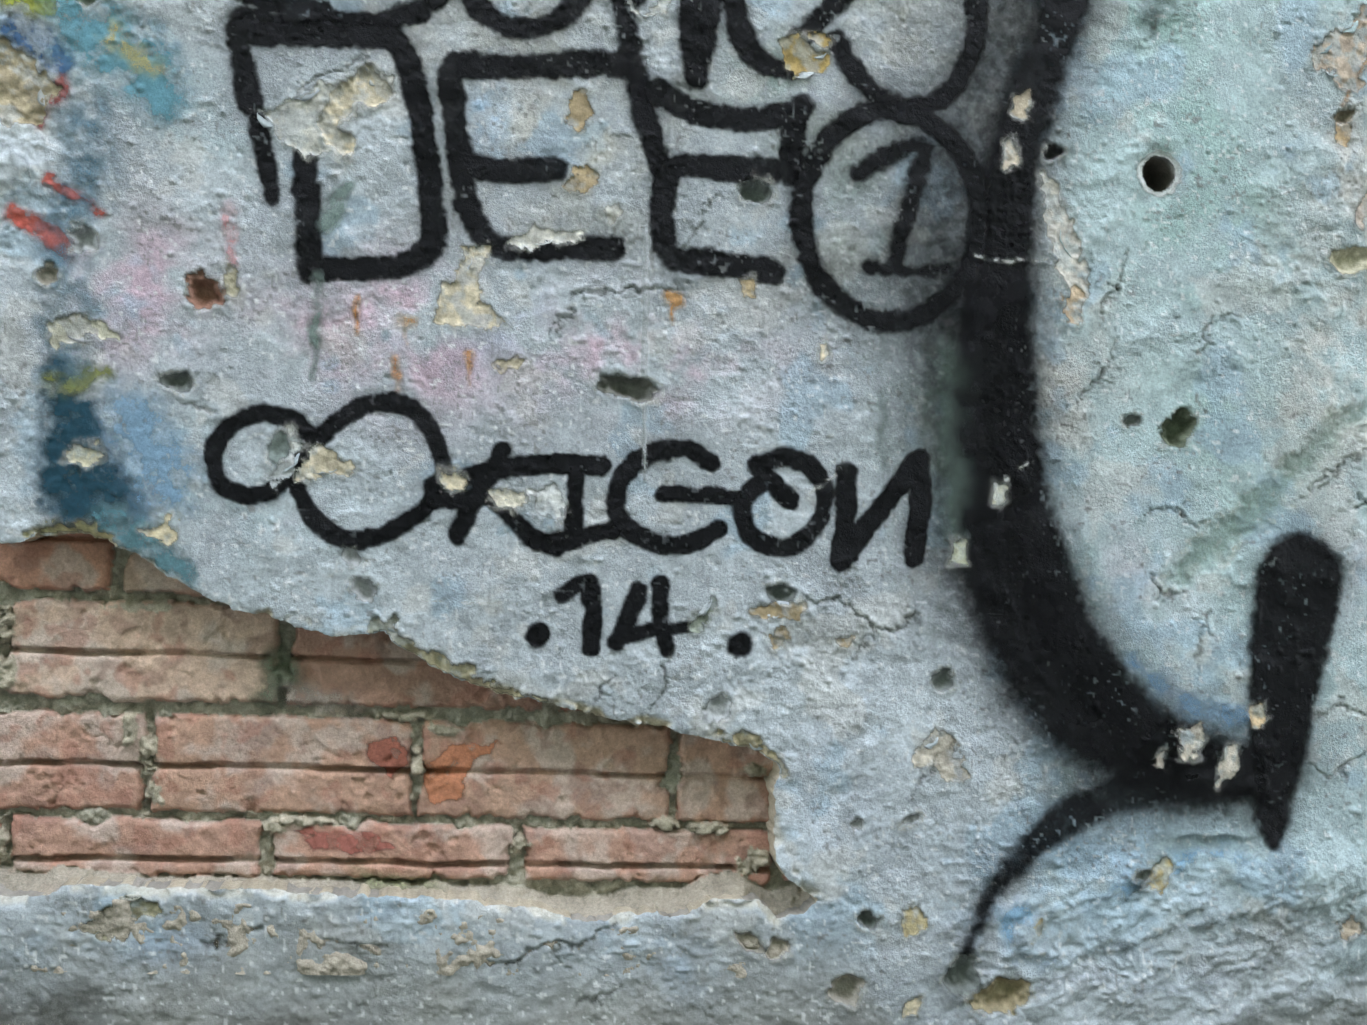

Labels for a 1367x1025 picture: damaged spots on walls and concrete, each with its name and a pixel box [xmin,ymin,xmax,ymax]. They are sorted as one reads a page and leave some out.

peeling [1311,4,1367,93]
peeling [0,36,63,128]
spalling [184,263,240,310]
peeling [433,223,584,331]
spalling [159,372,193,394]
spalling [596,374,659,406]
peeling [66,440,104,467]
peeling [267,425,355,489]
peeling [439,467,467,490]
peeling [488,483,565,523]
peeling [342,547,548,702]
peeling [748,584,807,650]